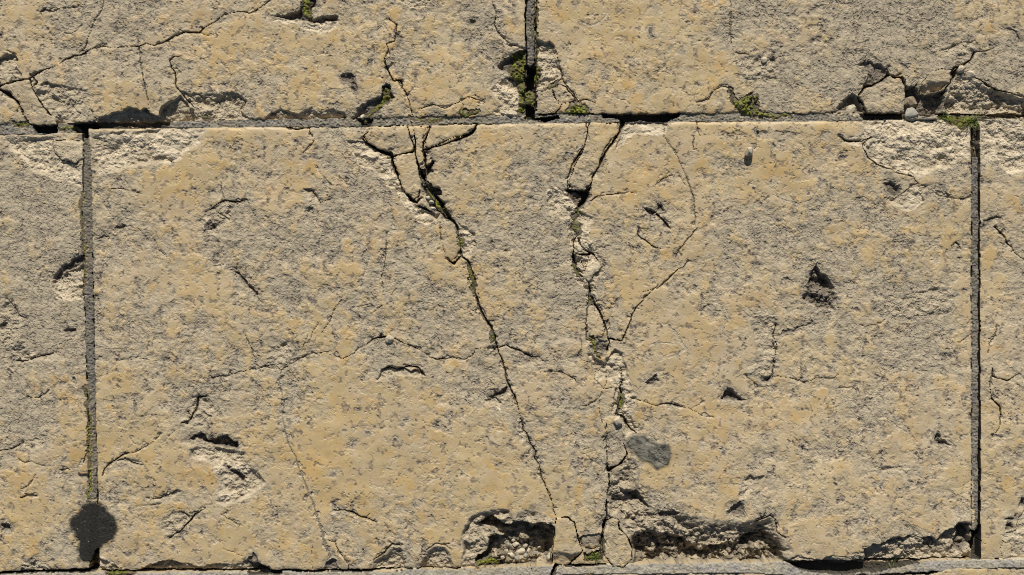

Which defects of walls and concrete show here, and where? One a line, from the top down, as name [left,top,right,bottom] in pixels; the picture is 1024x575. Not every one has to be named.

spalling [833,40,1024,212]
crack [0,0,750,571]
leakage [623,431,675,472]
leakage [66,497,121,566]
spalling [362,509,557,572]
spalling [607,457,971,564]